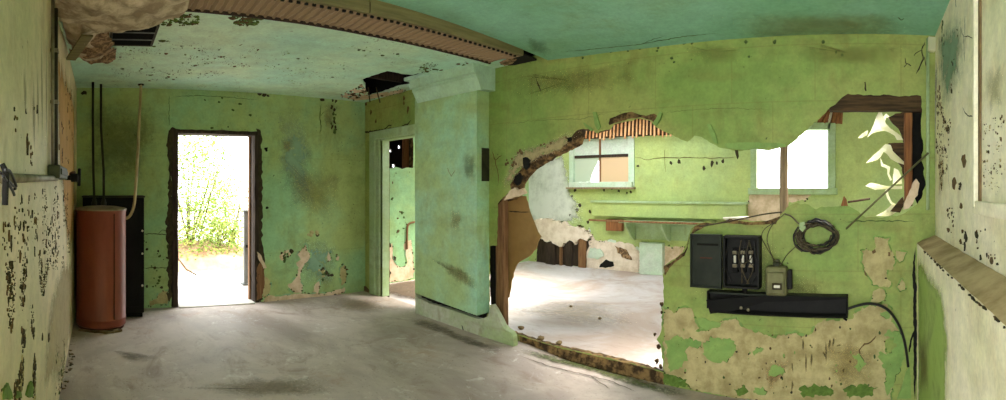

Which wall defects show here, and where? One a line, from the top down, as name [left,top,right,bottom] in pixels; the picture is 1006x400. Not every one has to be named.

peeling [161,14,200,26]
flaking render [265,51,409,134]
flaking render [256,129,348,302]
flaking render [664,195,811,275]
peeling [946,203,999,265]
peeling [0,186,70,400]
peeling [519,235,911,400]